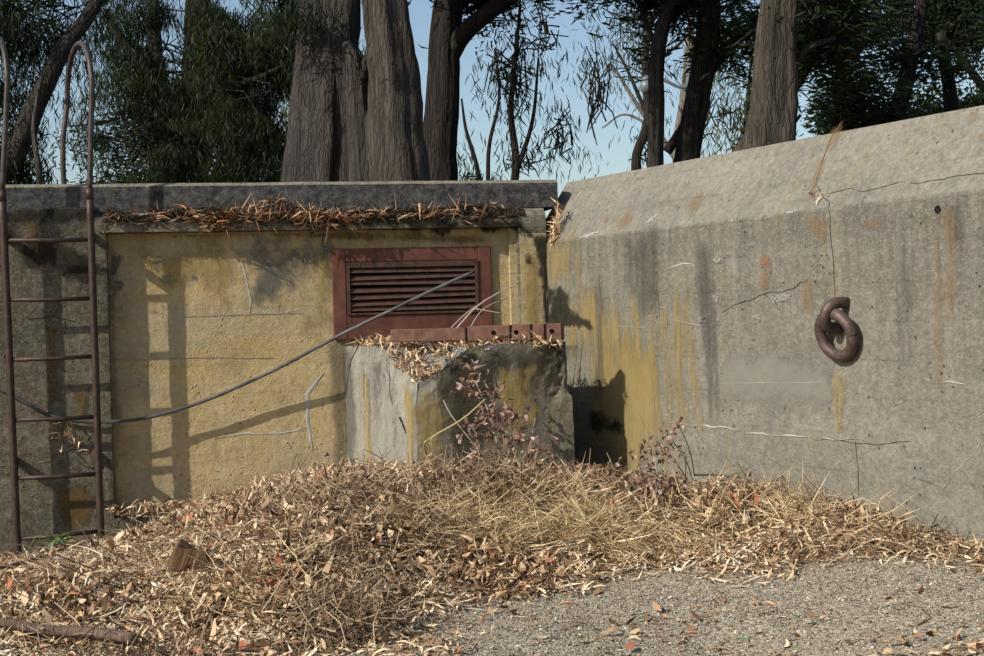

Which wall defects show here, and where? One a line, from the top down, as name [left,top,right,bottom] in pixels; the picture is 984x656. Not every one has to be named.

crack [808,129,984,289]
water stain [251,241,332,301]
crack [543,259,648,330]
crack [671,280,807,327]
water stain [570,294,662,471]
crack [666,422,907,494]